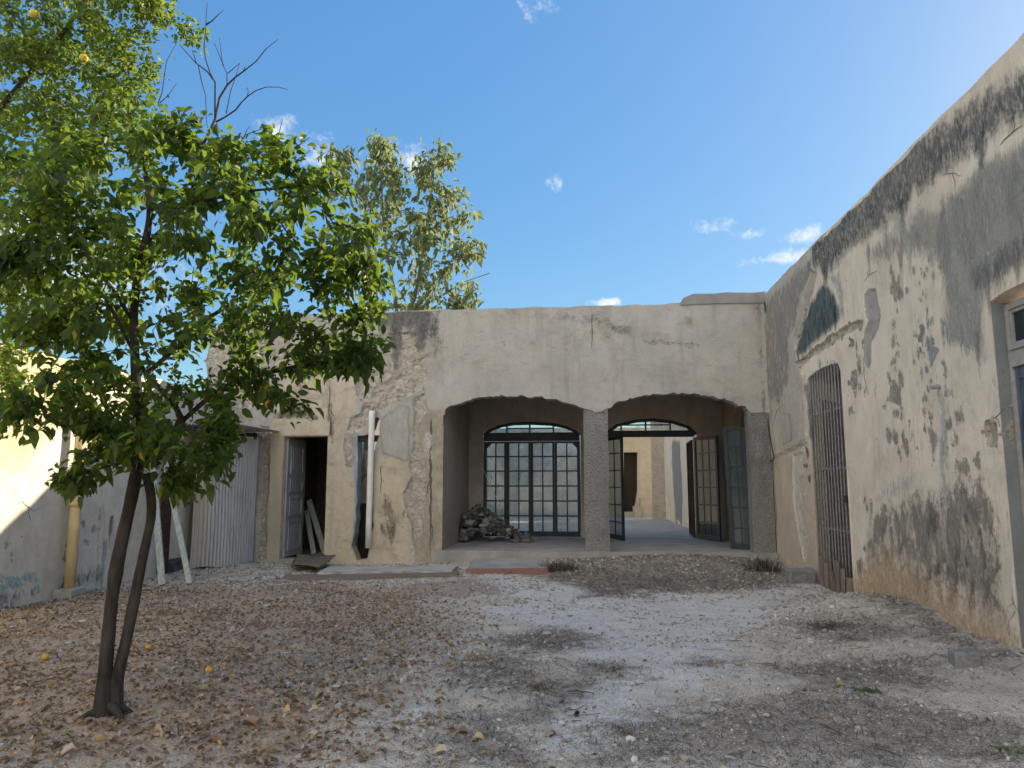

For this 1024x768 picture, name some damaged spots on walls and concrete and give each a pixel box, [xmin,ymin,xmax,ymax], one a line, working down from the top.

water stain [757,75,1024,423]
flaking render [343,331,433,563]
flaking render [795,254,998,481]
water stain [867,474,1009,626]